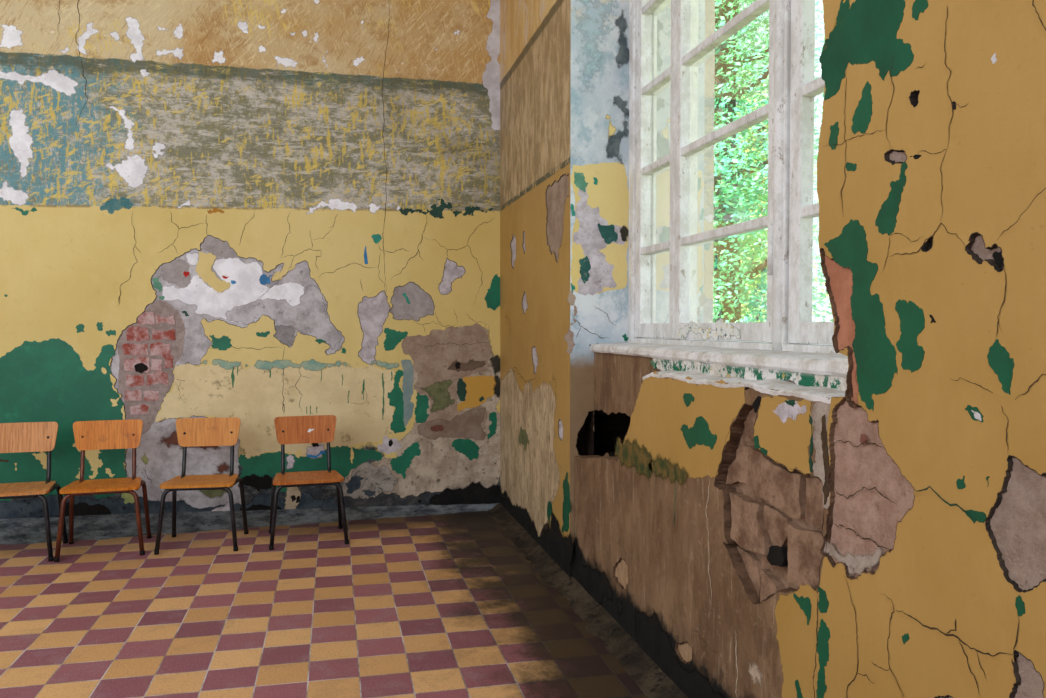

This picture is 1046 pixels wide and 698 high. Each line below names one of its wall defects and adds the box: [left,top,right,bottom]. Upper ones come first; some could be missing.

peeling [100,106,165,214]
peeling [819,0,929,150]
crack [824,6,970,267]
crack [118,211,208,300]
peeling [545,162,629,354]
crack [993,188,1046,335]
spalling [0,231,571,537]
flaking render [576,149,936,698]
damp [418,482,738,698]
crack [811,600,819,698]
crack [842,576,1019,698]
spalling [965,455,1046,616]